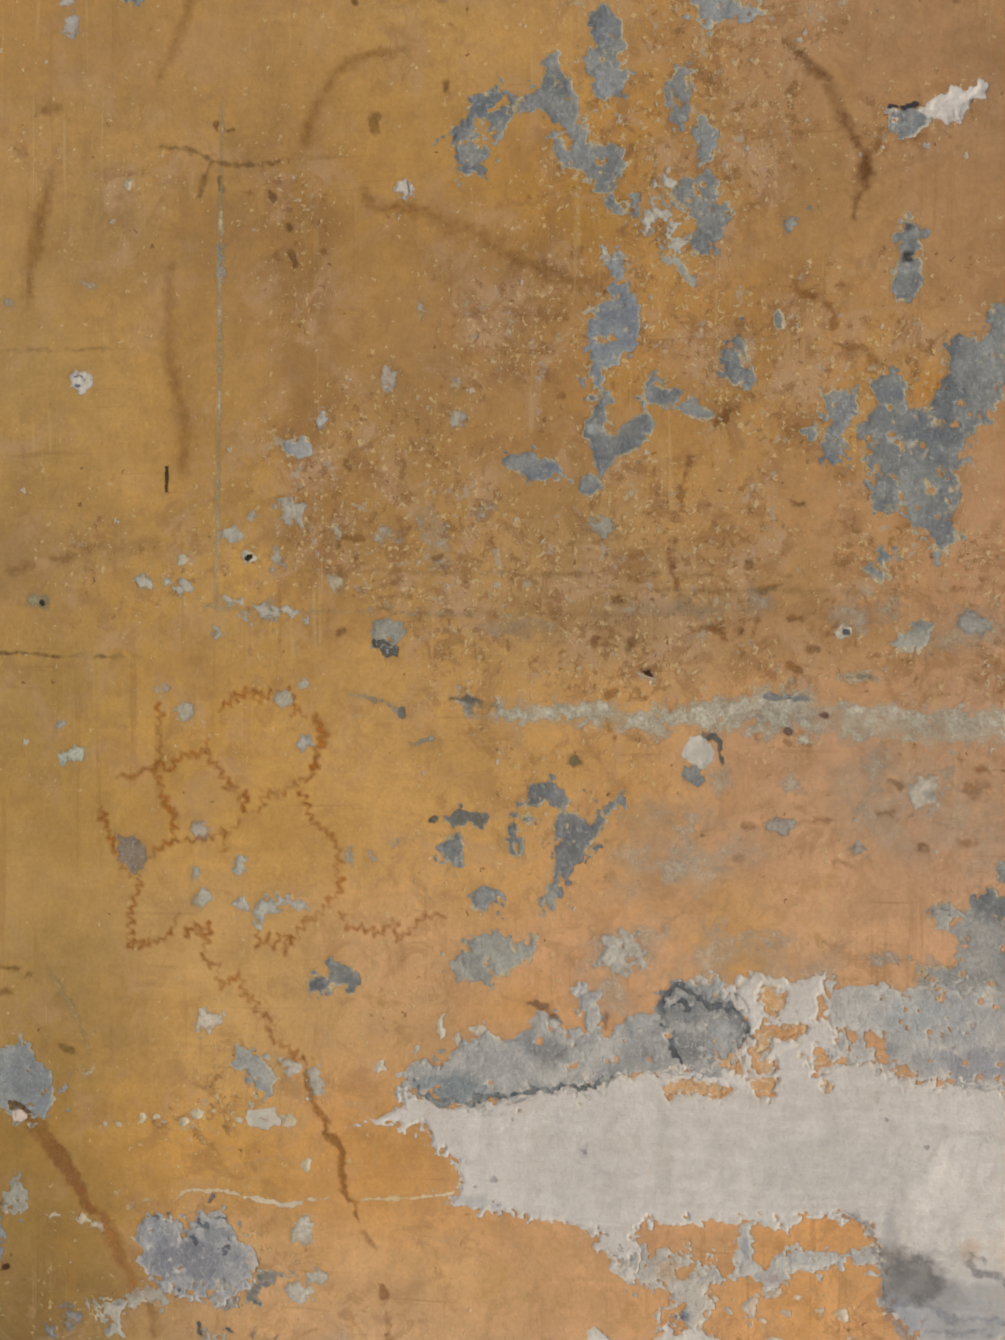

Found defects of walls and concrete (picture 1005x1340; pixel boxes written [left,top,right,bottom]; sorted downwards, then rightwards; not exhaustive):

peeling [875,77,989,149]
peeling [430,2,760,497]
peeling [887,211,937,303]
peeling [771,308,787,335]
peeling [795,298,1005,577]
peeling [860,545,902,585]
peeling [427,803,490,868]
peeling [440,773,629,990]
peeling [0,1030,95,1129]
spalling [346,859,1005,1340]
crack [125,1187,335,1211]
flaking render [42,1191,330,1340]